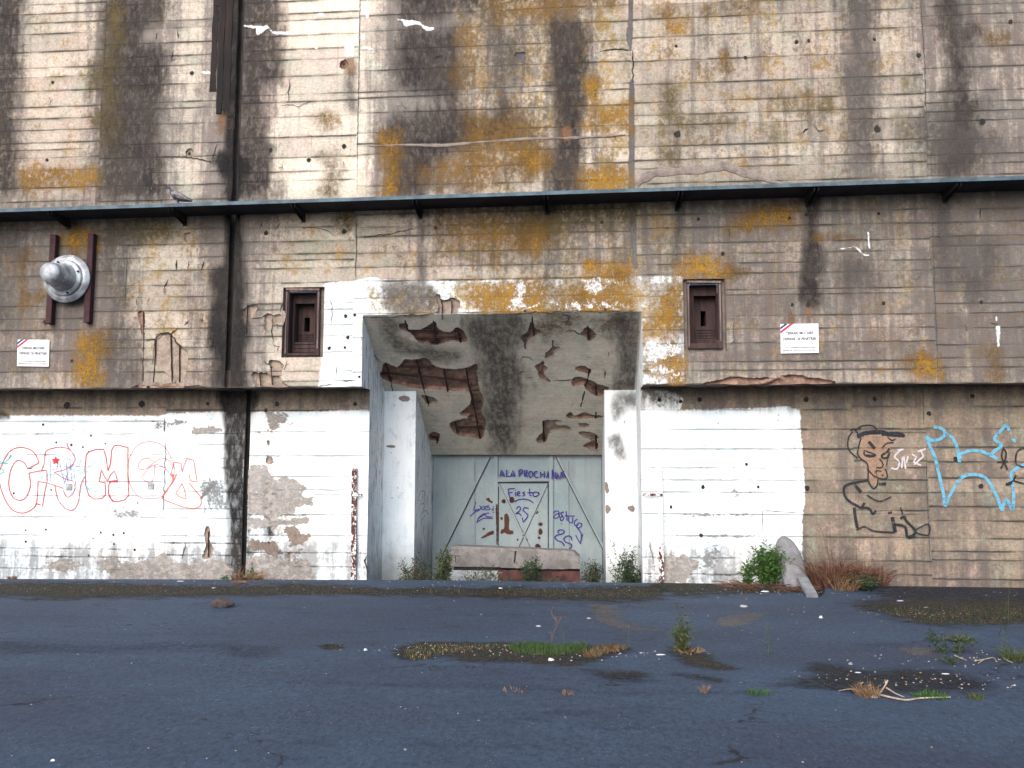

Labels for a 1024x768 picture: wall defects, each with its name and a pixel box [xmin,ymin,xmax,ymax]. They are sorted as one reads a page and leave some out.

damp [99,0,167,201]
damp [383,0,520,196]
damp [549,19,590,191]
damp [915,0,999,177]
damp [799,197,823,305]
spalling [131,311,205,388]
damp [207,215,257,579]
spalling [251,360,291,388]
spalling [380,358,486,444]
spalling [536,365,609,449]
spalling [702,374,836,385]
peeling [41,410,315,580]